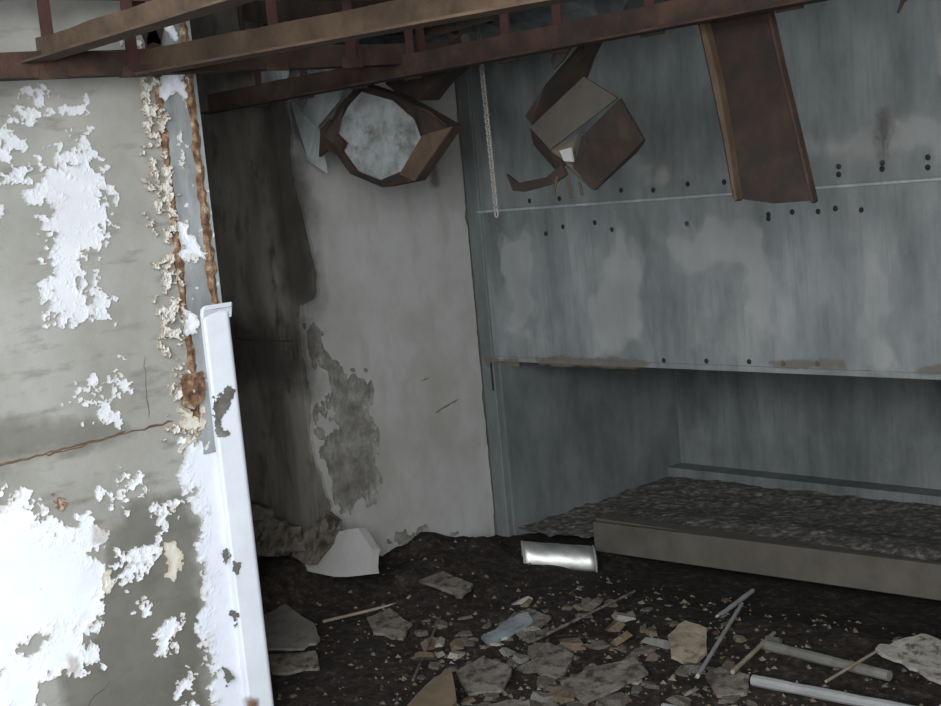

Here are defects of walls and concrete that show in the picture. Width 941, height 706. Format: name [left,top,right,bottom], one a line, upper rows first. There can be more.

rust [153,76,197,373]
rust [183,74,219,305]
crack [0,360,173,466]
peeling [0,74,245,706]
peeling [302,322,382,515]